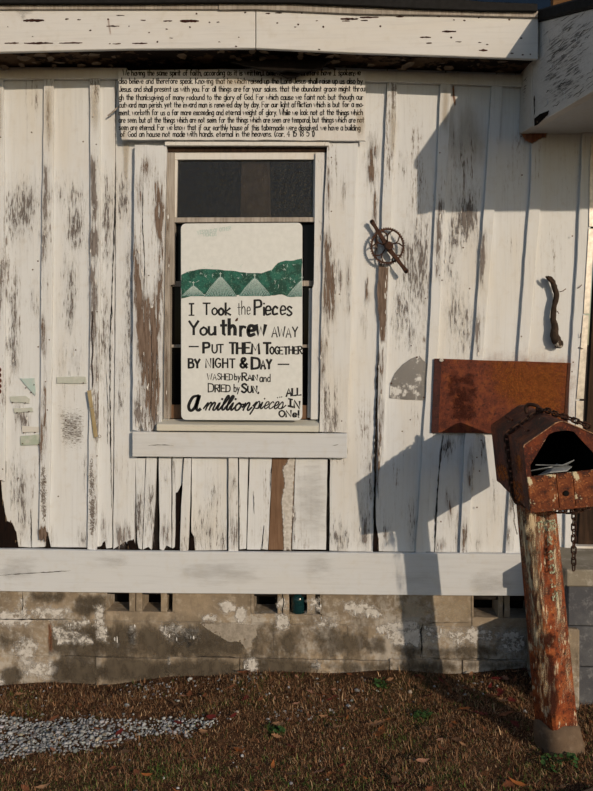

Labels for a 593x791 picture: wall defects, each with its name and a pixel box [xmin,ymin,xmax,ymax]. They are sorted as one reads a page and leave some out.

peeling [5,36,82,68]
peeling [368,143,378,221]
peeling [0,269,18,372]
peeling [6,155,141,383]
peeling [122,181,170,428]
peeling [321,234,350,320]
peeling [364,189,486,500]
corrosion [431,359,571,433]
corrosion [497,453,525,502]
damp [0,592,330,685]
spalling [202,623,257,649]
damp [310,599,524,673]